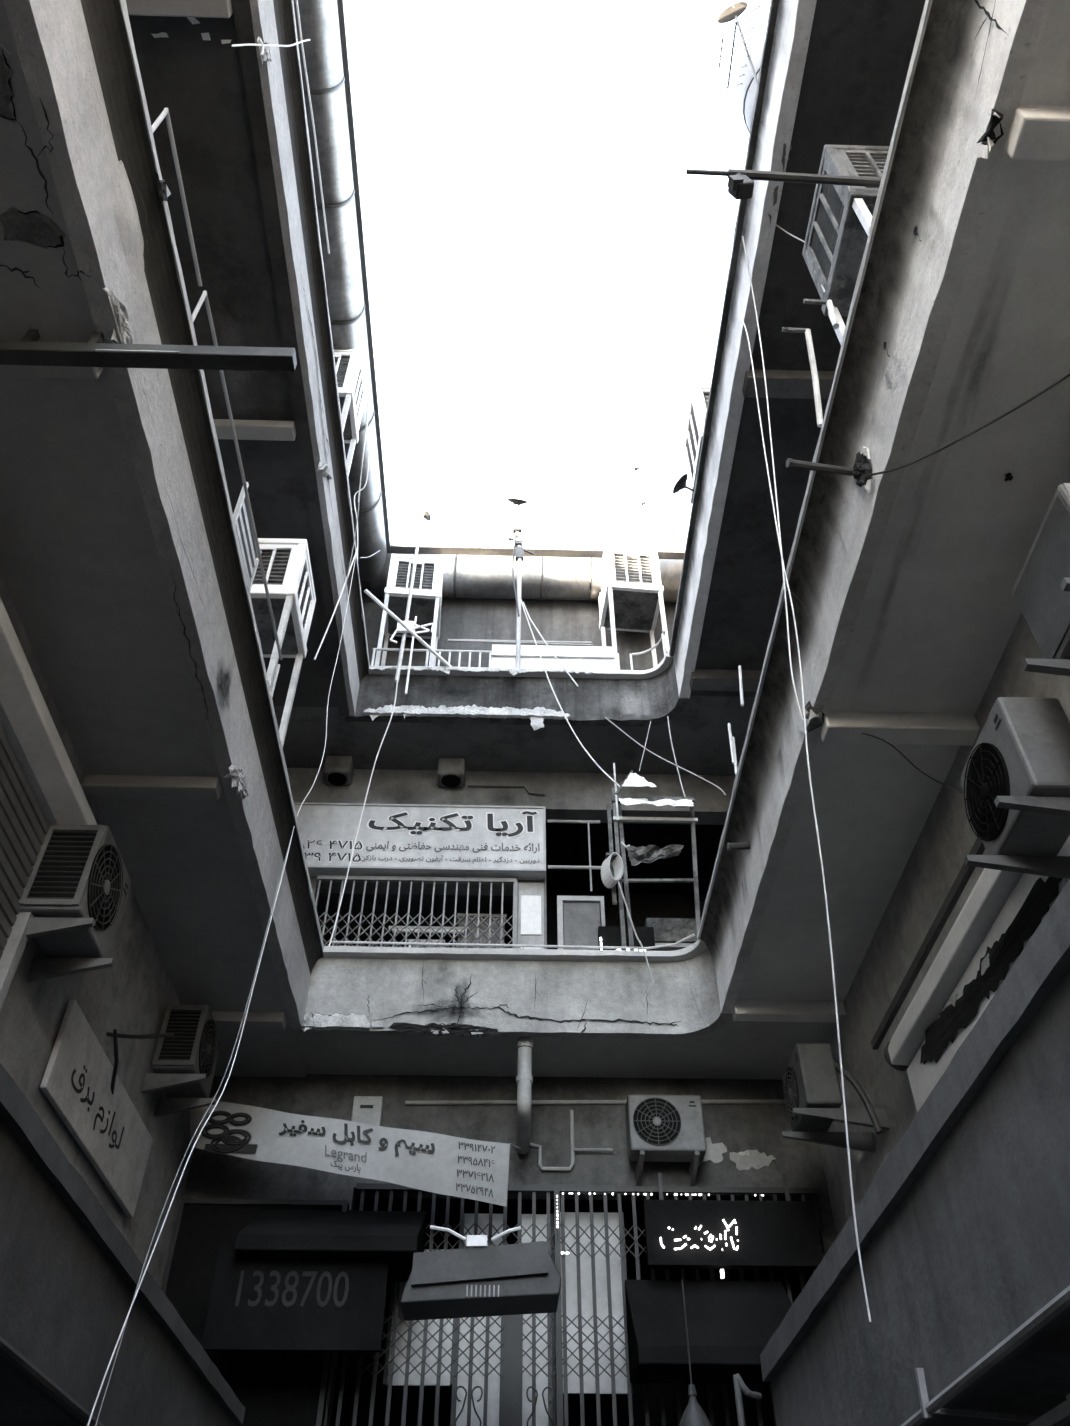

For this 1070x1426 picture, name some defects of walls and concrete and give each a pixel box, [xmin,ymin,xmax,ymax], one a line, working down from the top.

peeling [0,45,17,123]
peeling [0,206,66,249]
crack [319,961,702,1036]